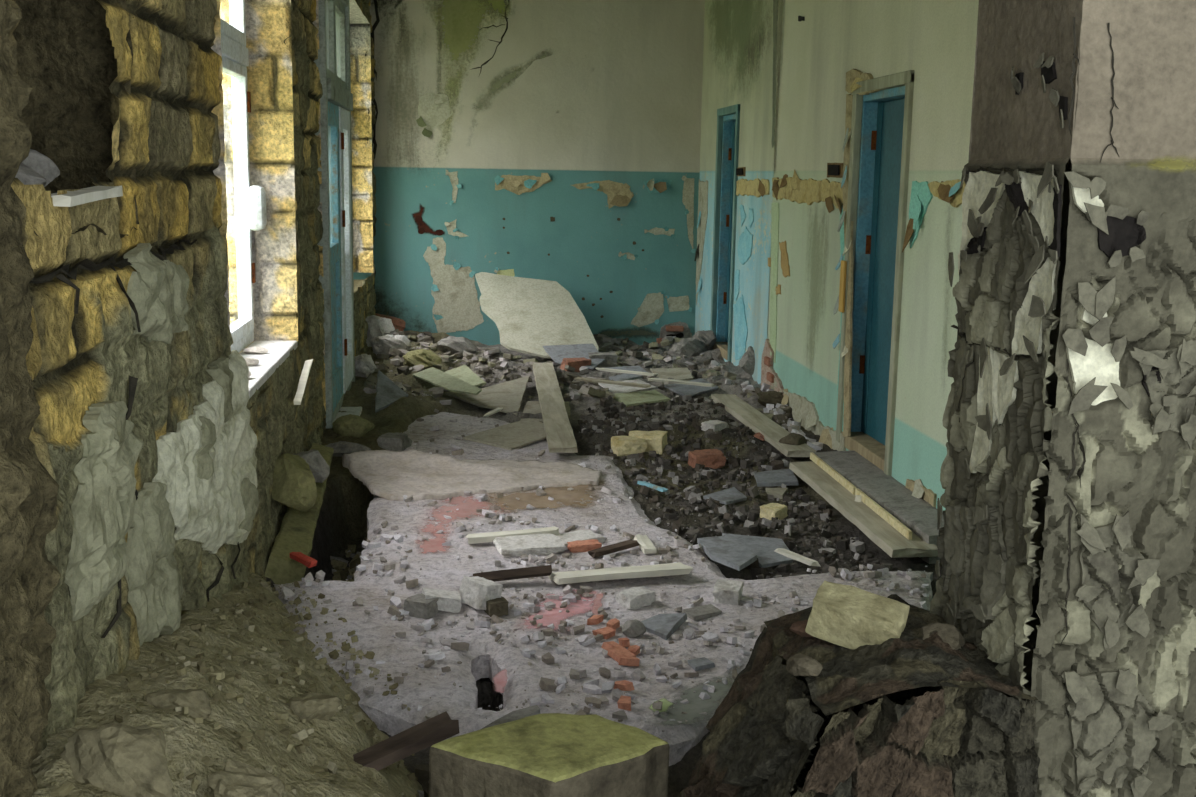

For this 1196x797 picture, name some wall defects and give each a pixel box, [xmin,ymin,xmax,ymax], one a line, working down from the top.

crack [370,0,392,160]
water stain [432,0,507,96]
crack [470,0,510,75]
crack [1068,17,1080,134]
crack [1100,23,1119,162]
peeling [446,170,462,205]
spalling [495,173,552,195]
peeling [423,219,484,333]
peeling [572,176,708,344]
spalling [733,69,882,451]
peeling [902,162,1196,479]
flaking render [64,350,260,647]